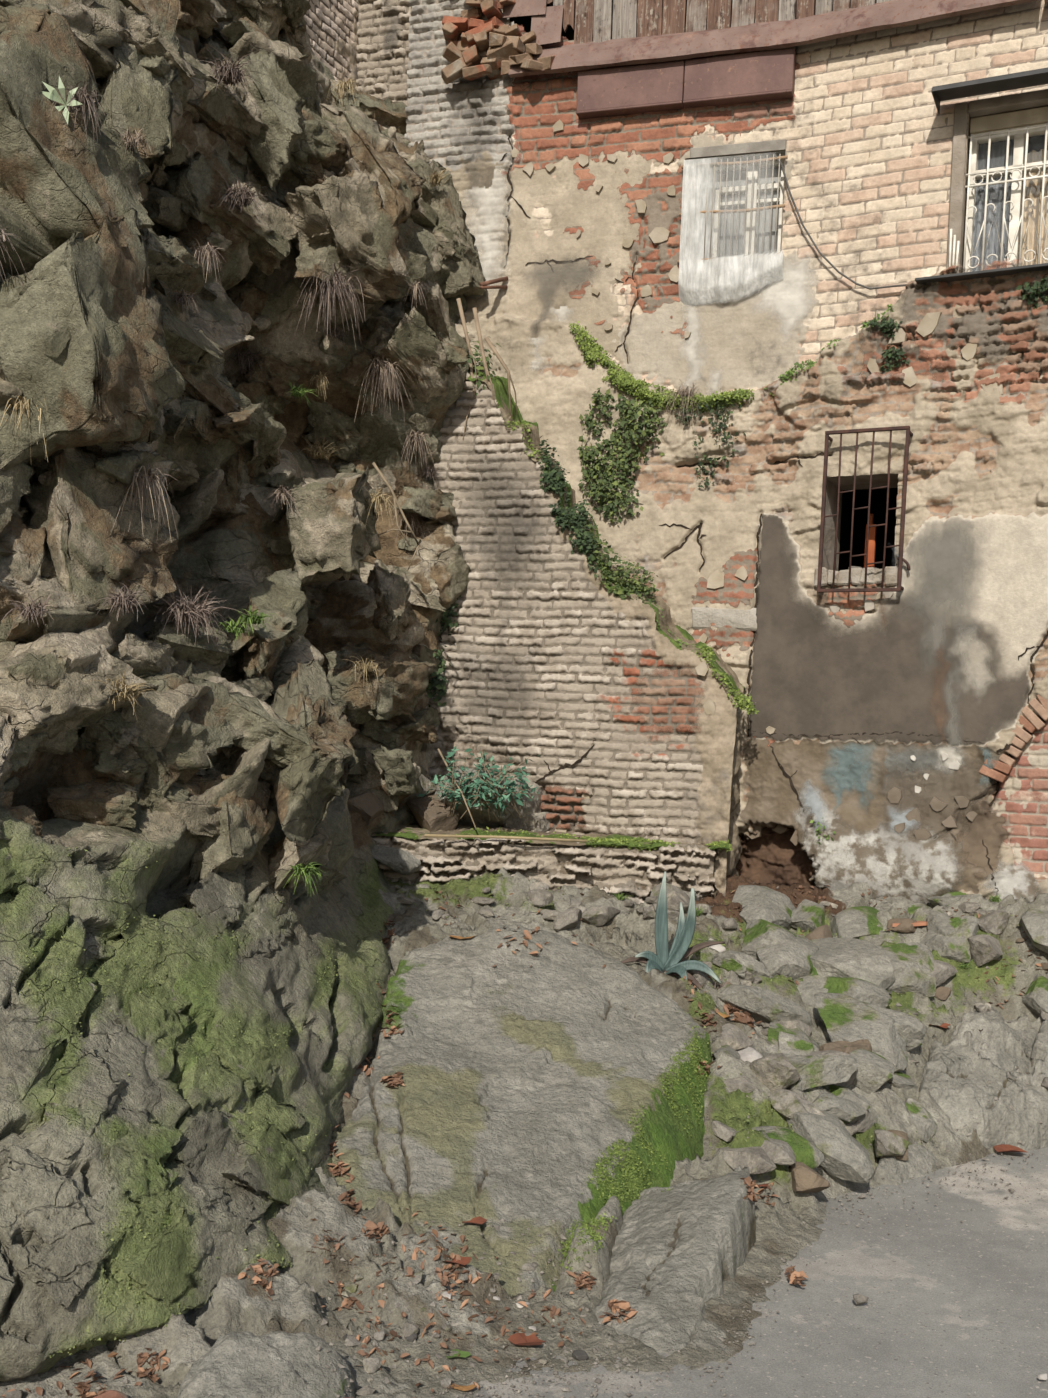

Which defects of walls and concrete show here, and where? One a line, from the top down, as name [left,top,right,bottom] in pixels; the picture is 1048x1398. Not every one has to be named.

crack [500,136,639,364]
spalling [501,72,795,339]
spalling [859,258,1048,394]
crack [659,523,706,572]
spalling [636,549,760,737]
crack [747,514,1048,812]
peeling [745,824,799,846]
crack [934,828,999,892]